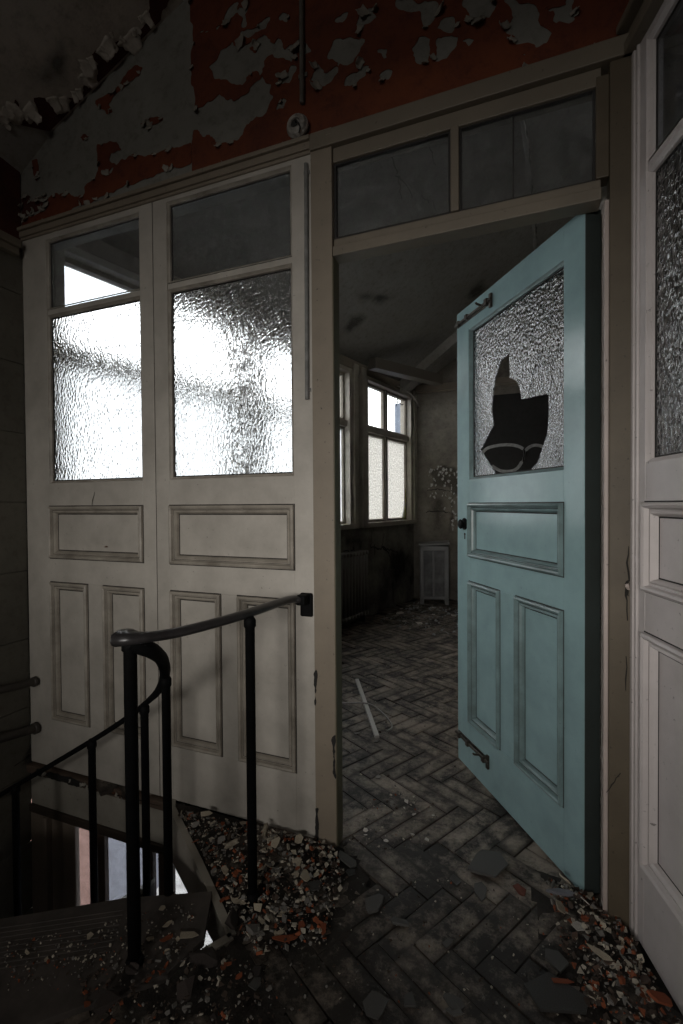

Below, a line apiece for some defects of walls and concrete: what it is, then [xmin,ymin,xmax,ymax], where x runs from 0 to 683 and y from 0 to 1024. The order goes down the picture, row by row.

peeling [0,0,629,226]